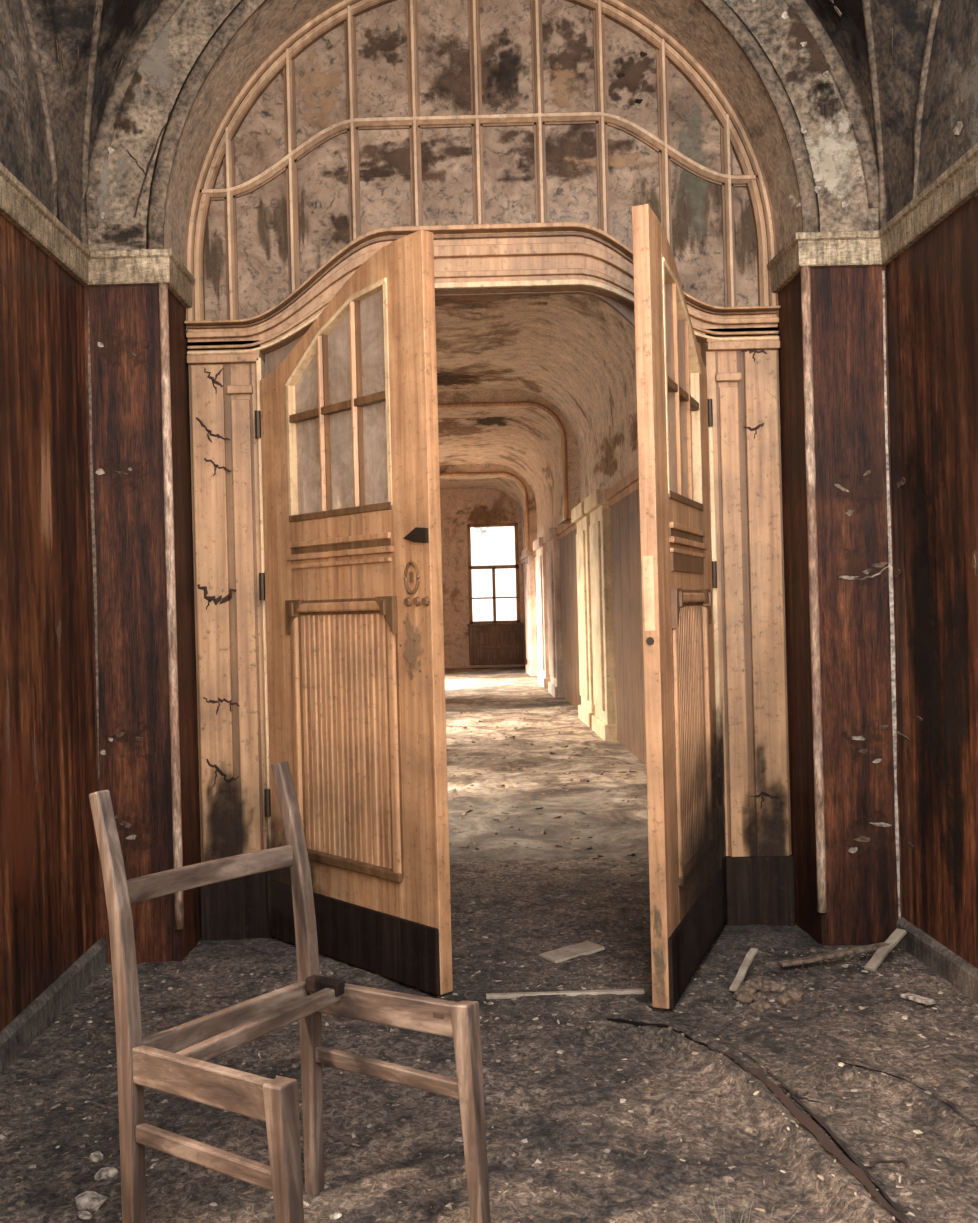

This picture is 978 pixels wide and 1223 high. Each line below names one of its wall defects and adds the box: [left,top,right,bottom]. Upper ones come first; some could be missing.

leakage [808,83,839,122]
leakage [96,225,144,248]
crack [204,368,223,394]
crack [196,417,231,476]
crack [197,584,237,610]
crack [203,697,239,715]
crack [207,759,239,787]
leakage [204,776,247,862]
leakage [744,748,787,857]
crack [837,1060,978,1128]
crack [606,1018,912,1223]